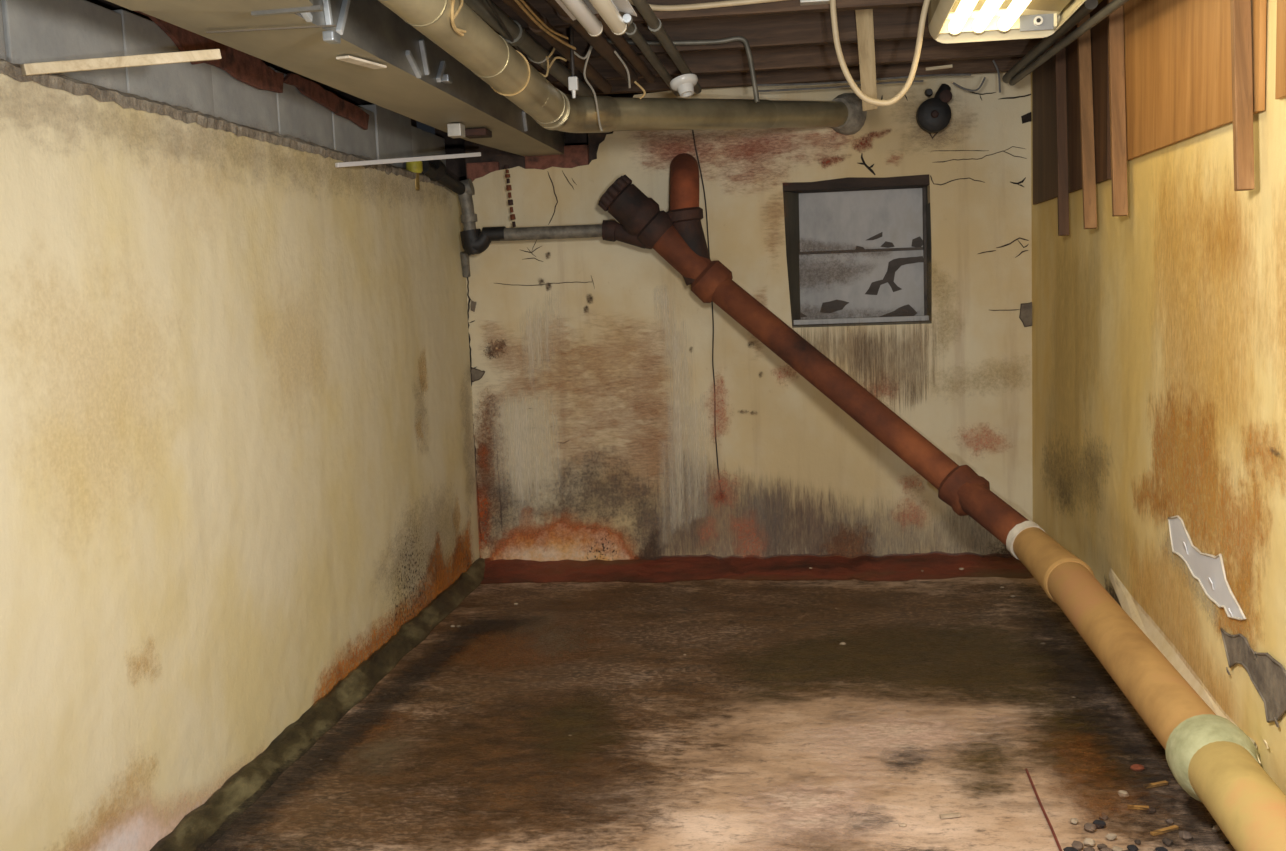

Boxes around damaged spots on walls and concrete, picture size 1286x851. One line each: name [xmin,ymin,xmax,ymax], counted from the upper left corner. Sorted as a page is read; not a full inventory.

crack [968,91,1031,100]
crack [930,146,1027,187]
crack [467,171,595,387]
crack [473,424,503,540]
leakage [490,464,939,559]
leakage [207,579,1234,851]
flaking render [1105,567,1269,765]
peeling [1167,515,1286,728]
leakage [80,795,212,851]